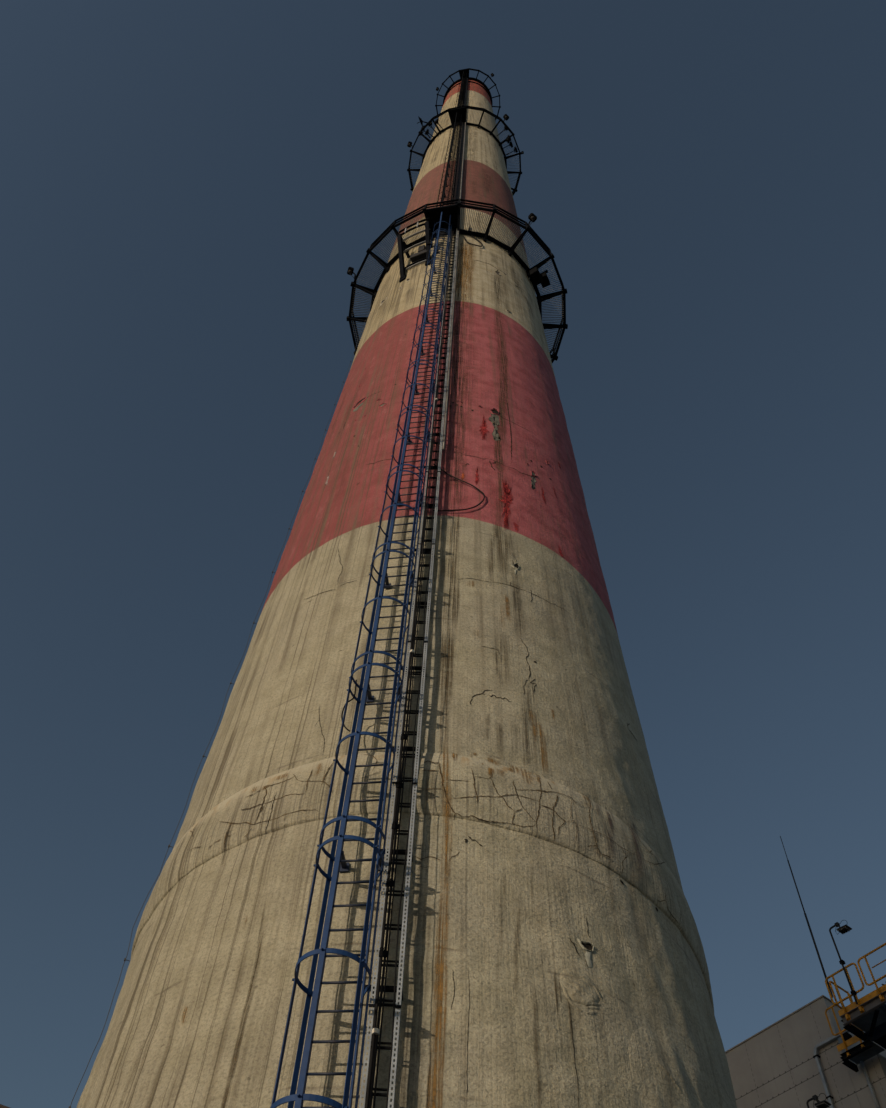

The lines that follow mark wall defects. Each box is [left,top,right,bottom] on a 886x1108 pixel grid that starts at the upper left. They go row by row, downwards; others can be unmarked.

crack [470,638,536,704]
crack [415,761,665,874]
corrosion [427,753,457,1108]
spalling [577,938,594,967]